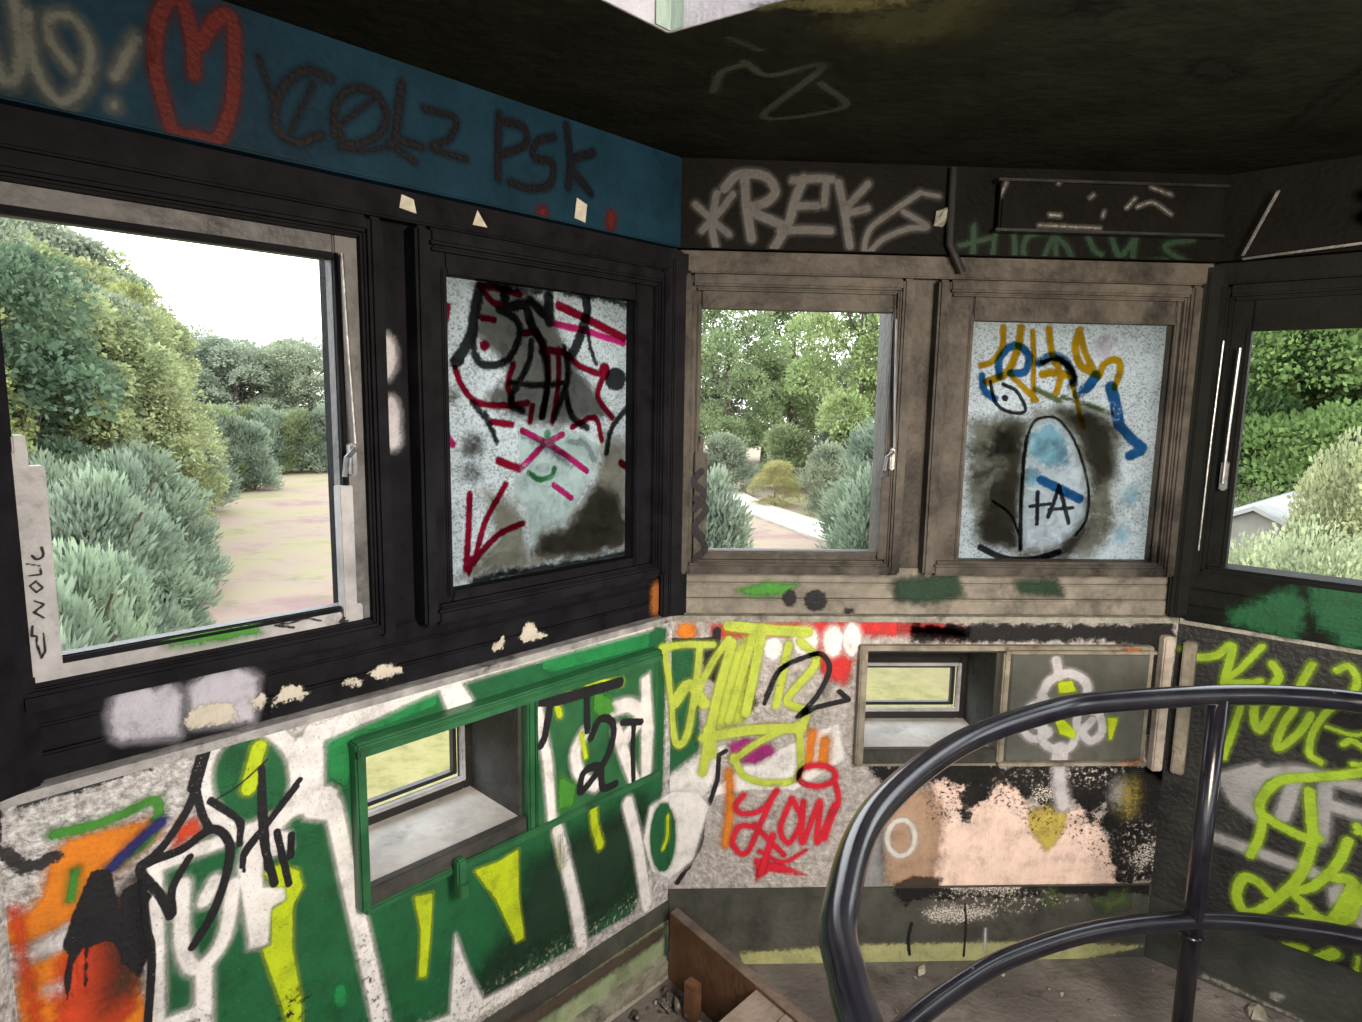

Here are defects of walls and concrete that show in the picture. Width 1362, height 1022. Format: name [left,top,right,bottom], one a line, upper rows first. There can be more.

peeling [342,663,402,688]